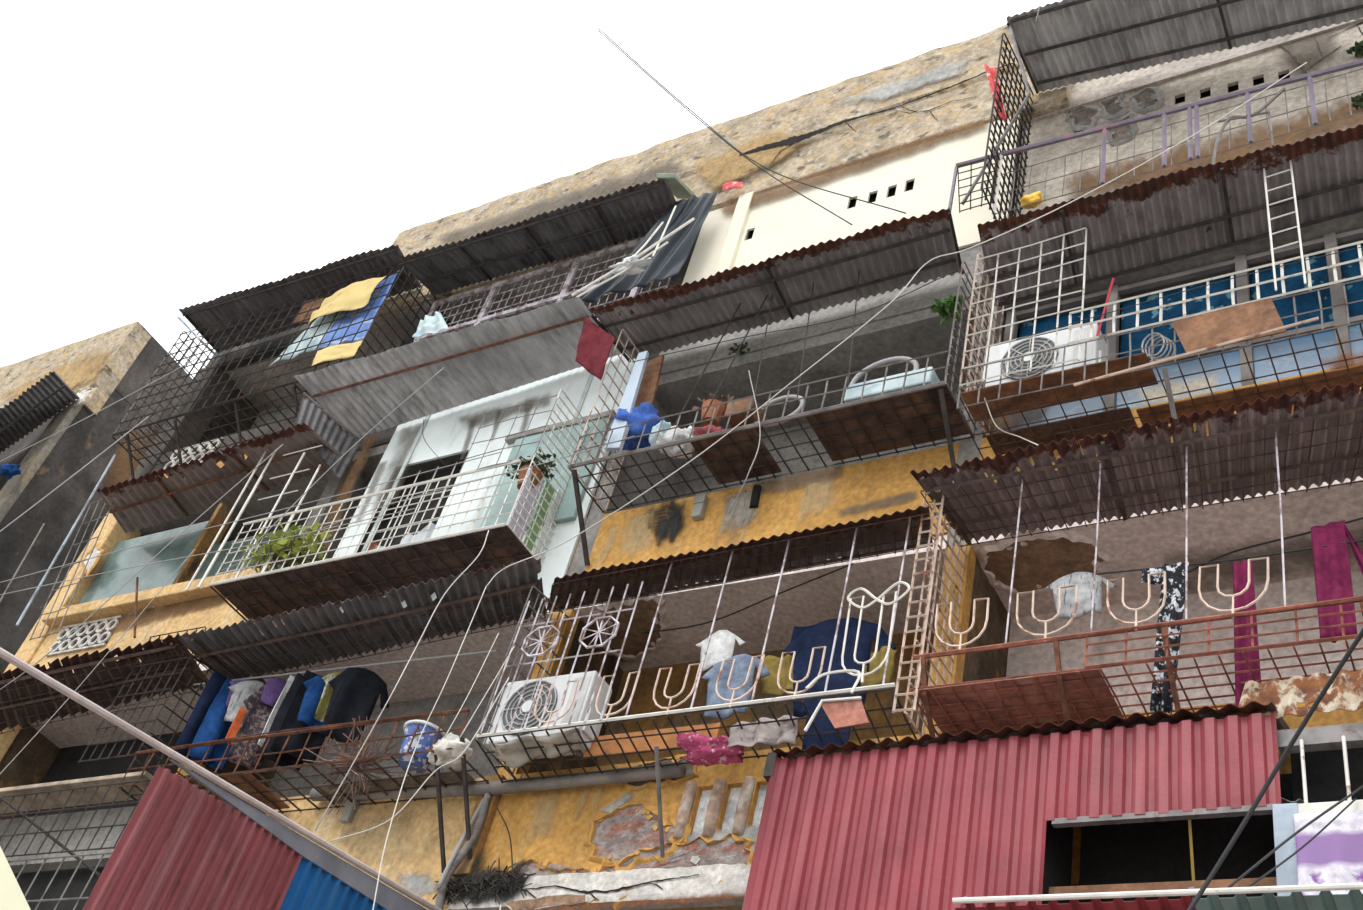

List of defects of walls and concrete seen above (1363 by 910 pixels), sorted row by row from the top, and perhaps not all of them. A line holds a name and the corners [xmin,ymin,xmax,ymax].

crack [739,63,1013,163]
flaking render [976,528,1116,599]
flaking render [508,754,755,876]
peeling [504,894,628,910]